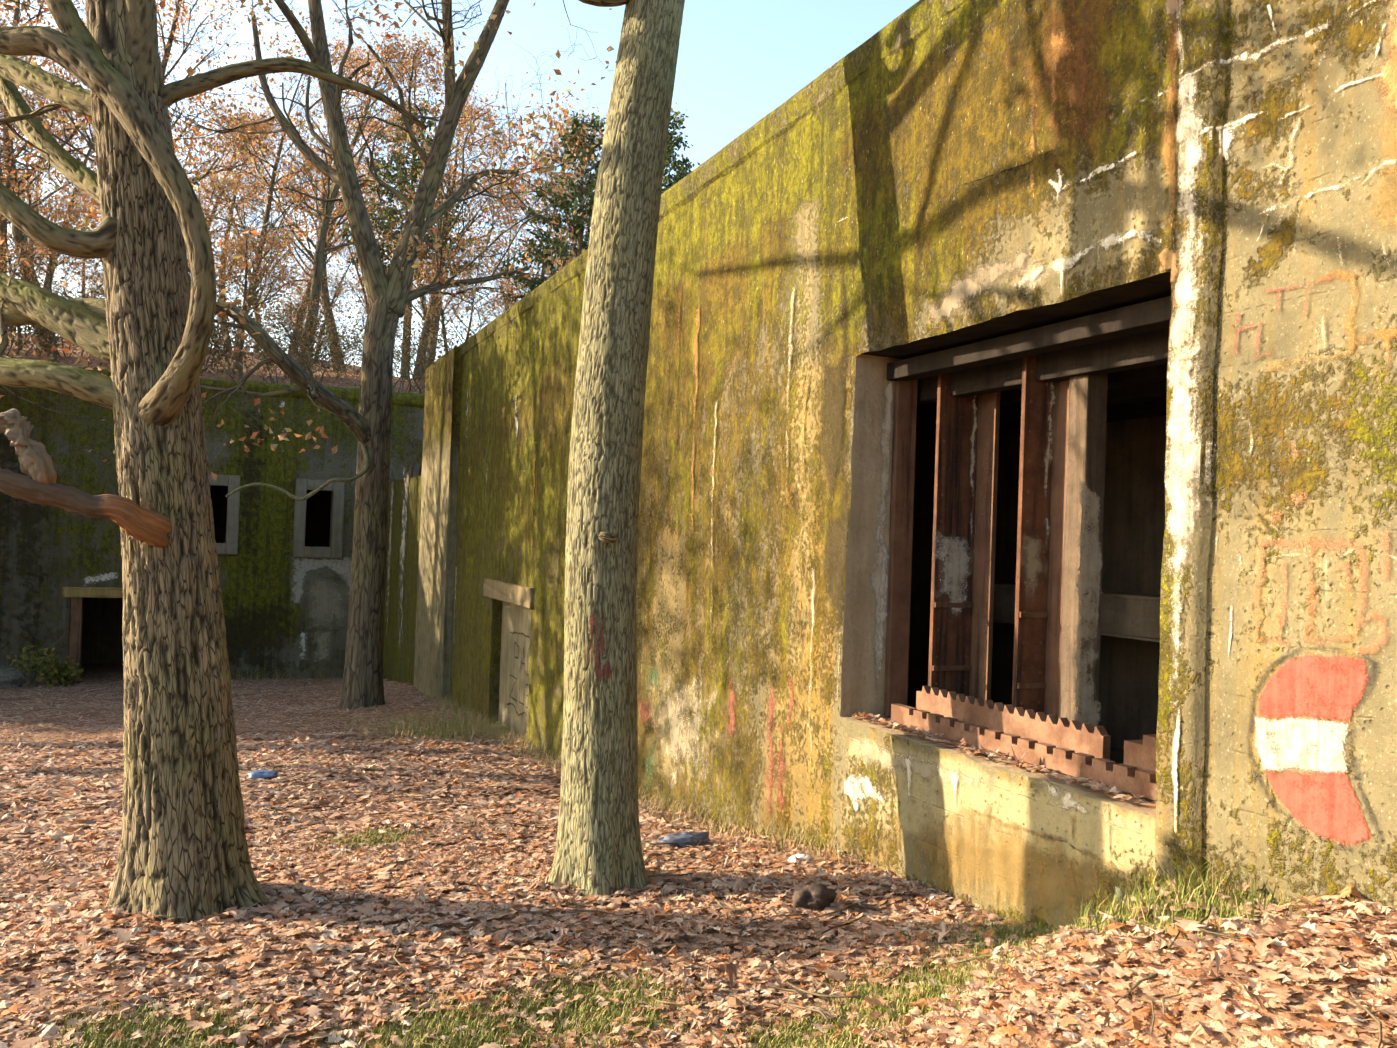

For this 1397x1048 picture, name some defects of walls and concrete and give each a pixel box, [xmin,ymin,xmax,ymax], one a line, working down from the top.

rust [1162,83,1176,228]
damp [1164,0,1209,648]
peeling [844,742,972,811]
damp [1172,710,1180,832]